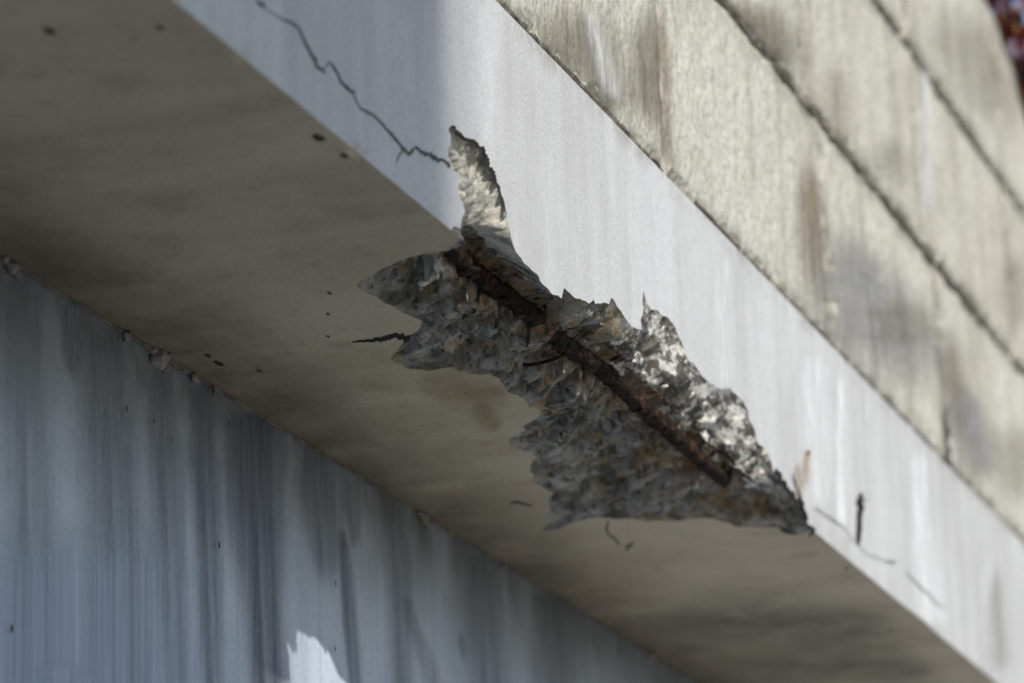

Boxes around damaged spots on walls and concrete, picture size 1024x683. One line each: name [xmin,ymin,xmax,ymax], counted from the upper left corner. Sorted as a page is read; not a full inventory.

crack [257,0,451,169]
crack [352,333,411,343]
spalling [355,126,810,536]
leakage [17,469,172,683]
leakage [235,418,282,683]